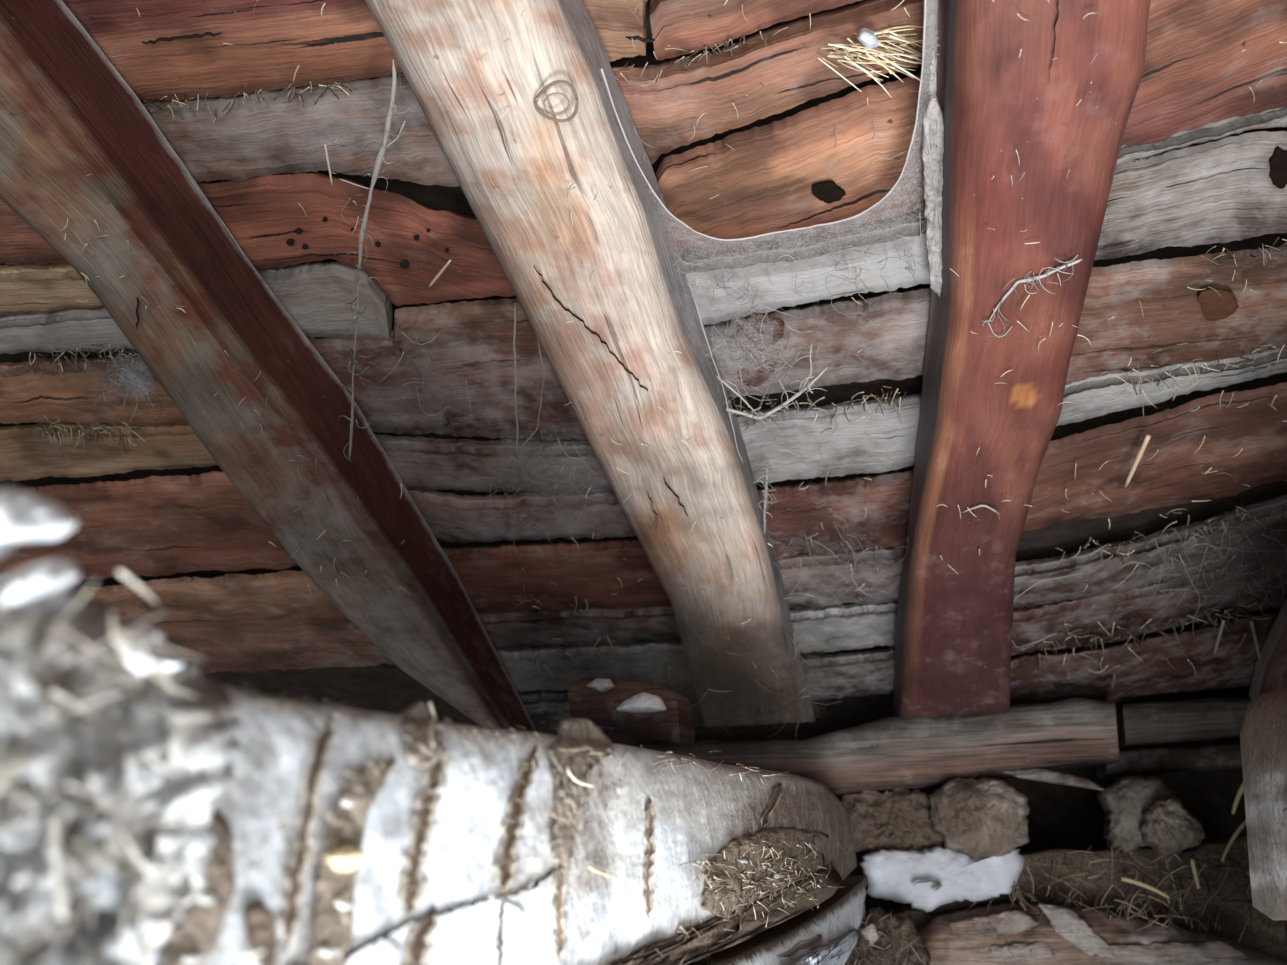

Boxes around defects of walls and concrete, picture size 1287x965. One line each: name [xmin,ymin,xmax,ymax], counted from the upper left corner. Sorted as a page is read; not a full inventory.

crack [1049,0,1059,83]